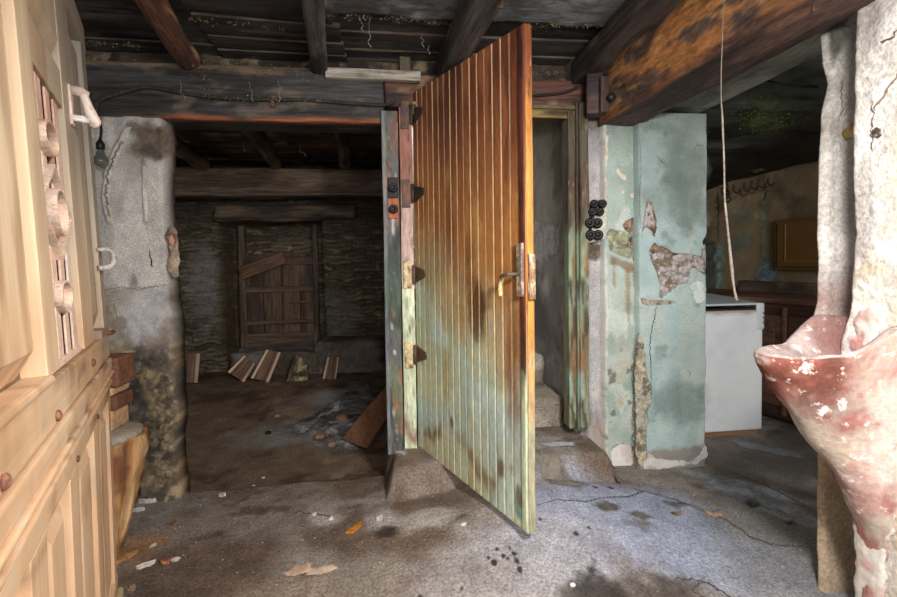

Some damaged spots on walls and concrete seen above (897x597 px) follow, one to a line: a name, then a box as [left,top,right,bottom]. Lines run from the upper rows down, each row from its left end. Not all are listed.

crack [869,74,897,150]
flaking render [623,199,723,305]
damp [128,352,152,466]
spalling [610,337,708,469]
crack [538,307,815,549]
damp [580,568,624,597]
crack [674,577,731,597]